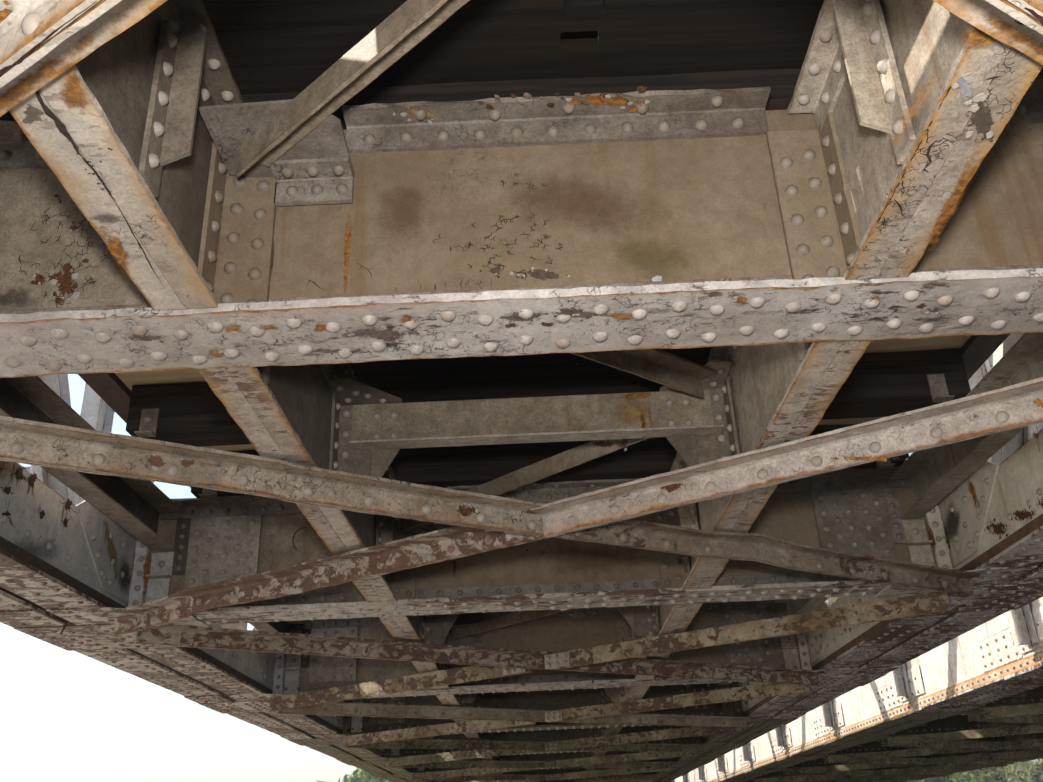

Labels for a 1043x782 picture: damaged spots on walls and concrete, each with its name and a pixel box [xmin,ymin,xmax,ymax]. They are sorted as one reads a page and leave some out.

corrosion [0,38,93,110]
corrosion [478,86,650,113]
crack [395,173,562,290]
crack [863,86,951,251]
corrosion [929,165,969,243]
crack [4,196,167,349]
peeling [312,326,423,355]
peeling [496,307,611,324]
corrosion [984,497,1043,540]
peeling [280,586,303,595]